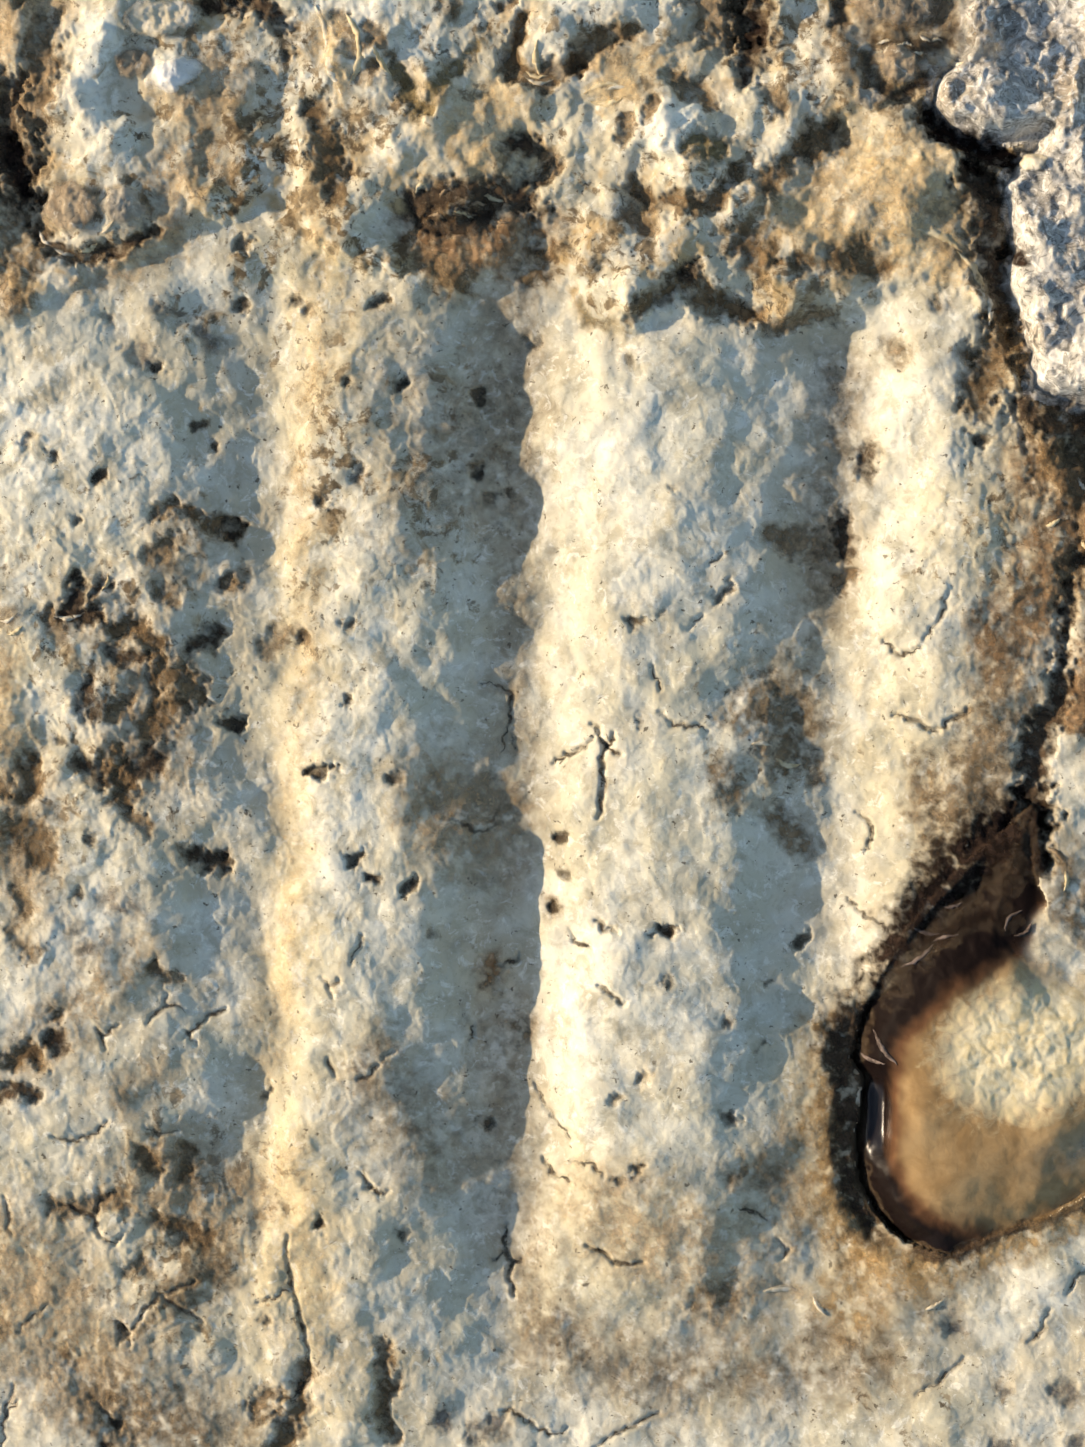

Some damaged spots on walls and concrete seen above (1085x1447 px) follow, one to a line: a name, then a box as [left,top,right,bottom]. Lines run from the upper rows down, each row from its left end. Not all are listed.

crack [555,726,619,812]
spalling [902,902,1032,967]
spalling [861,1030,897,1065]
crack [262,1248,311,1399]